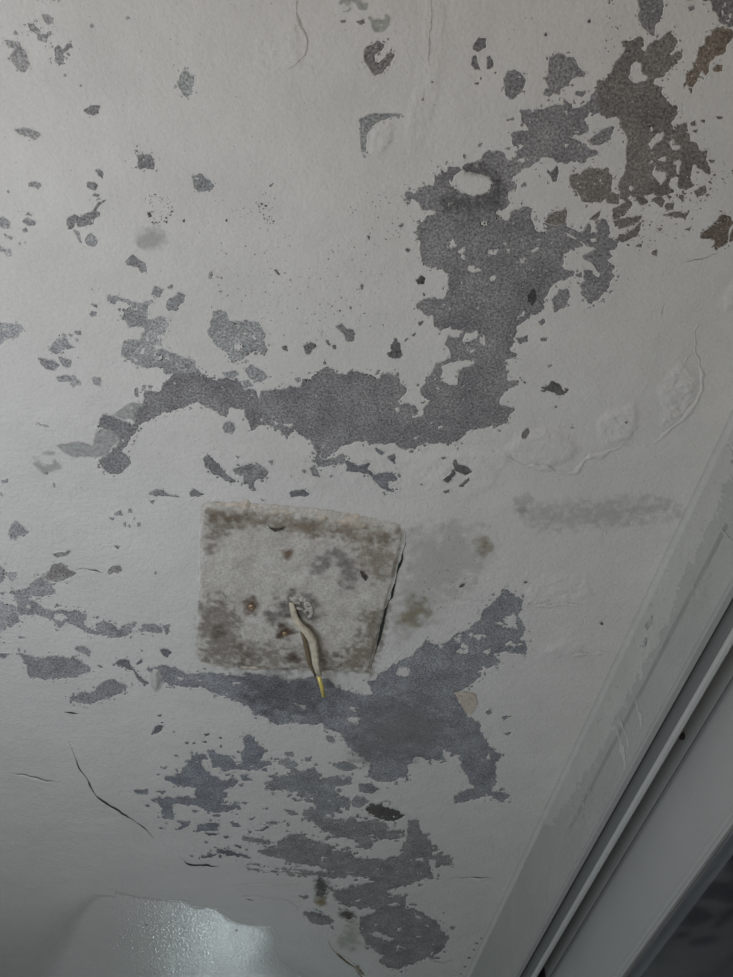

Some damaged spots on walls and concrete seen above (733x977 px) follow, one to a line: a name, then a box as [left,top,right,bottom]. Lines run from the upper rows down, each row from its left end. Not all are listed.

peeling [82,103,102,117]
peeling [65,167,108,249]
peeling [89,0,733,502]
peeling [0,320,26,347]
peeling [148,487,206,505]
crack [69,743,153,838]
peeling [0,549,534,976]
crack [328,941,367,977]